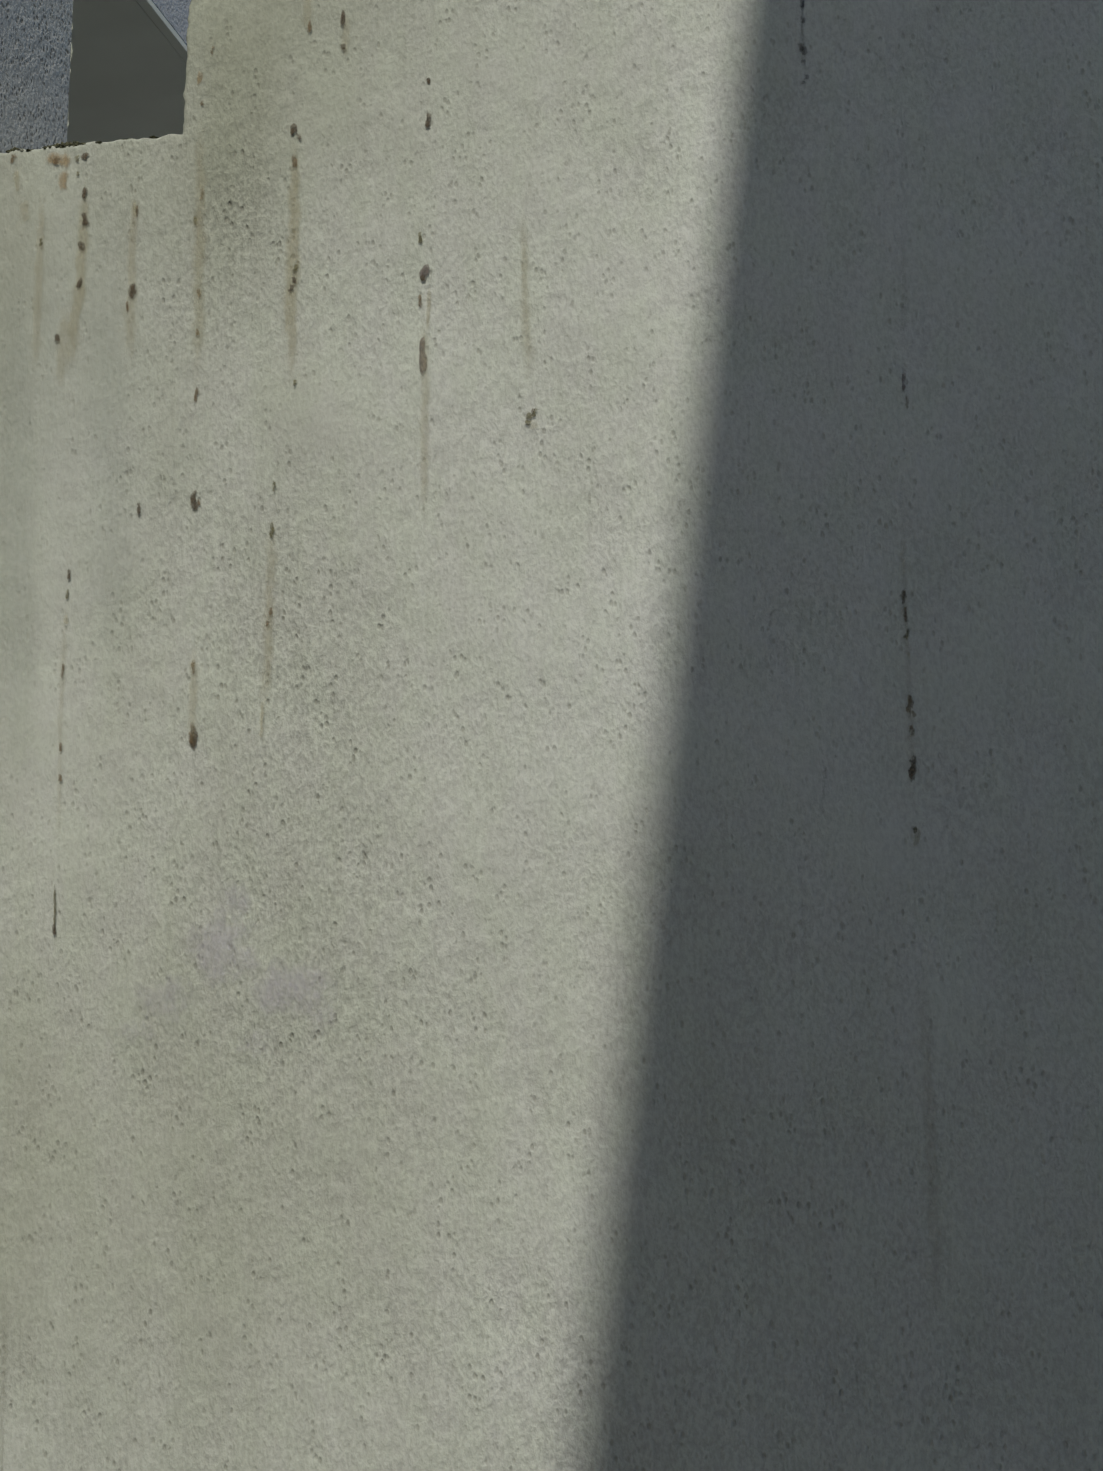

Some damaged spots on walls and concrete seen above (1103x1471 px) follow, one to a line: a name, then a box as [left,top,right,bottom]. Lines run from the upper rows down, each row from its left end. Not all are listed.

rust [908,755,916,780]